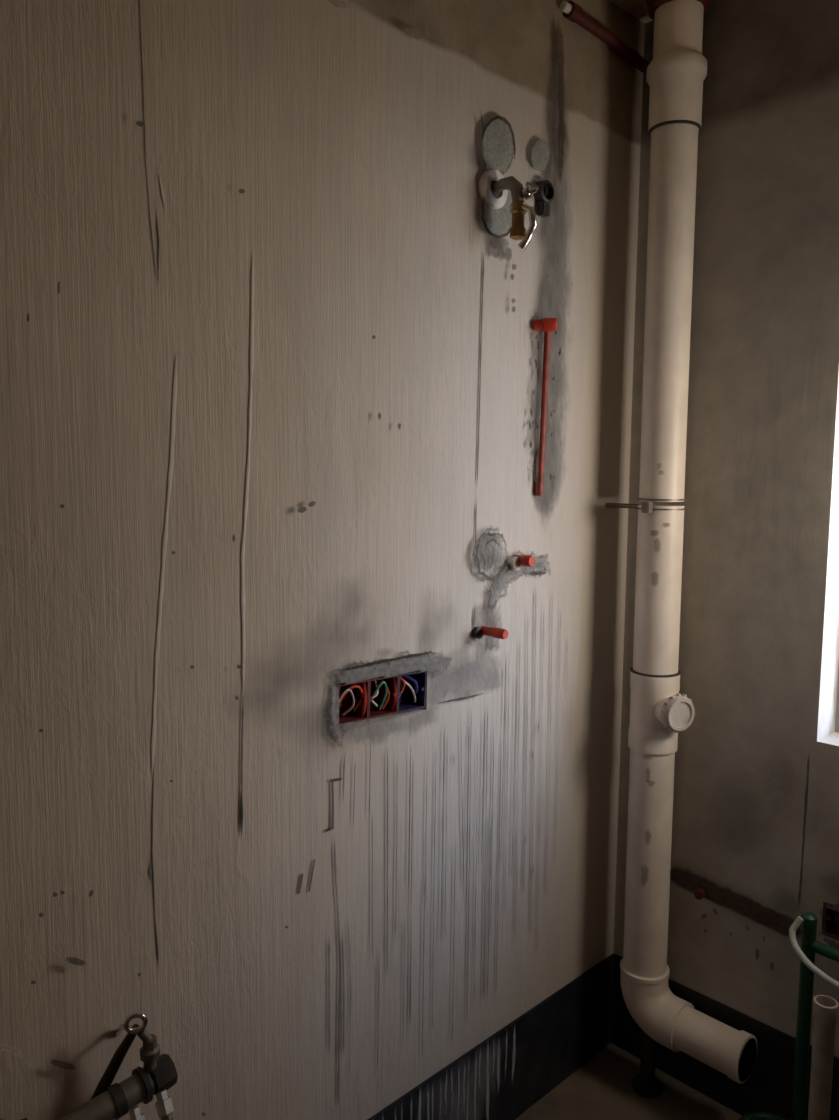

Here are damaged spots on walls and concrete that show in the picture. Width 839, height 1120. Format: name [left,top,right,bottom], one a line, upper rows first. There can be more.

crack [139,0,159,279]
crack [148,768,159,966]